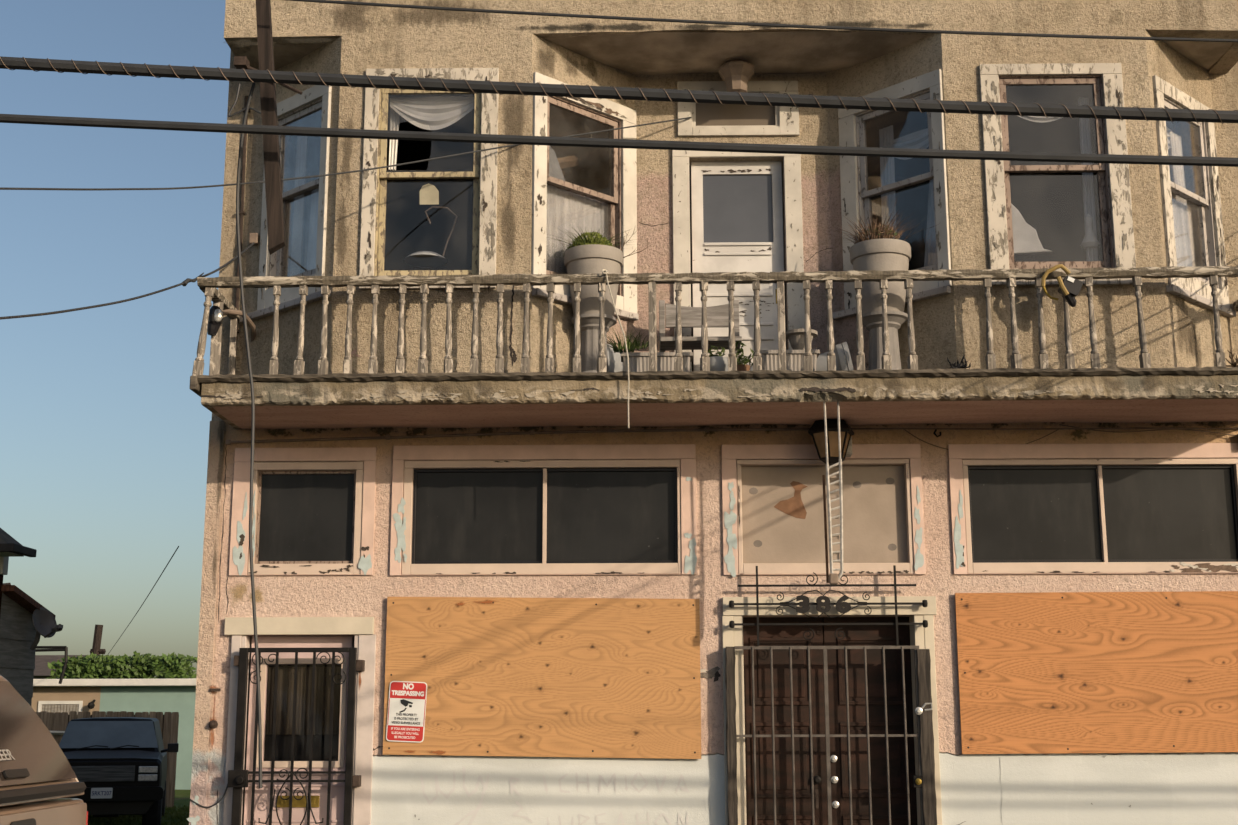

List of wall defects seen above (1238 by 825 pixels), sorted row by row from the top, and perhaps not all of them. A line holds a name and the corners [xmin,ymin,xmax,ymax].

peeling [1106,79,1123,122]
peeling [566,97,627,118]
peeling [985,80,1002,164]
crack [509,285,517,366]
peeling [356,390,463,401]
peeling [491,389,575,400]
peeling [622,388,696,400]
peeling [1022,386,1073,396]
peeling [1193,384,1238,394]
peeling [233,492,372,576]
peeling [1150,562,1238,574]